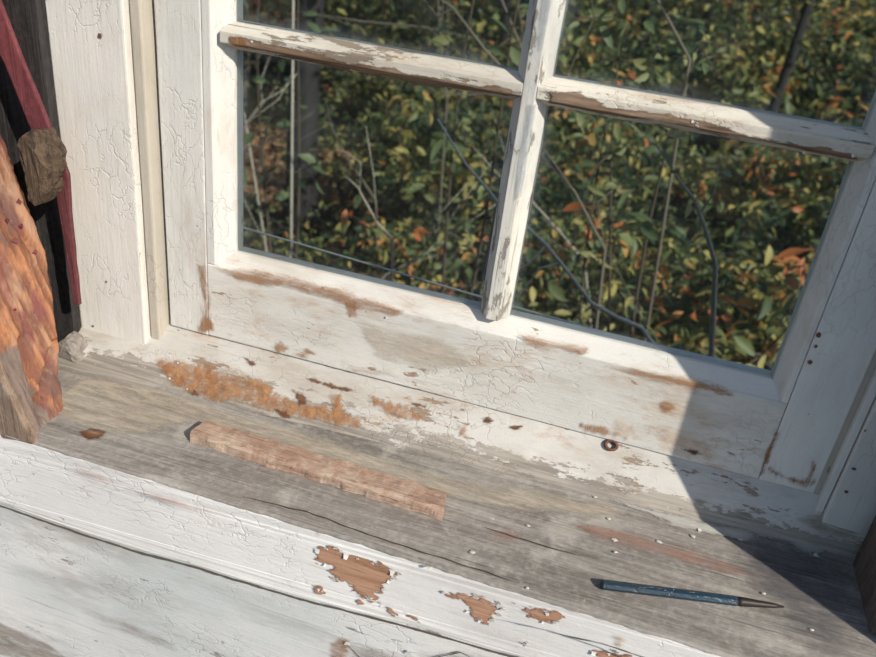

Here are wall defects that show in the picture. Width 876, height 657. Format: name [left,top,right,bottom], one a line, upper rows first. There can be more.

peeling [549,91,858,160]
crack [485,527,580,556]
crack [0,497,516,657]
peeling [314,545,421,624]
peeling [442,592,565,625]
peeling [0,624,62,657]
crack [546,631,643,657]
peeling [592,638,632,657]